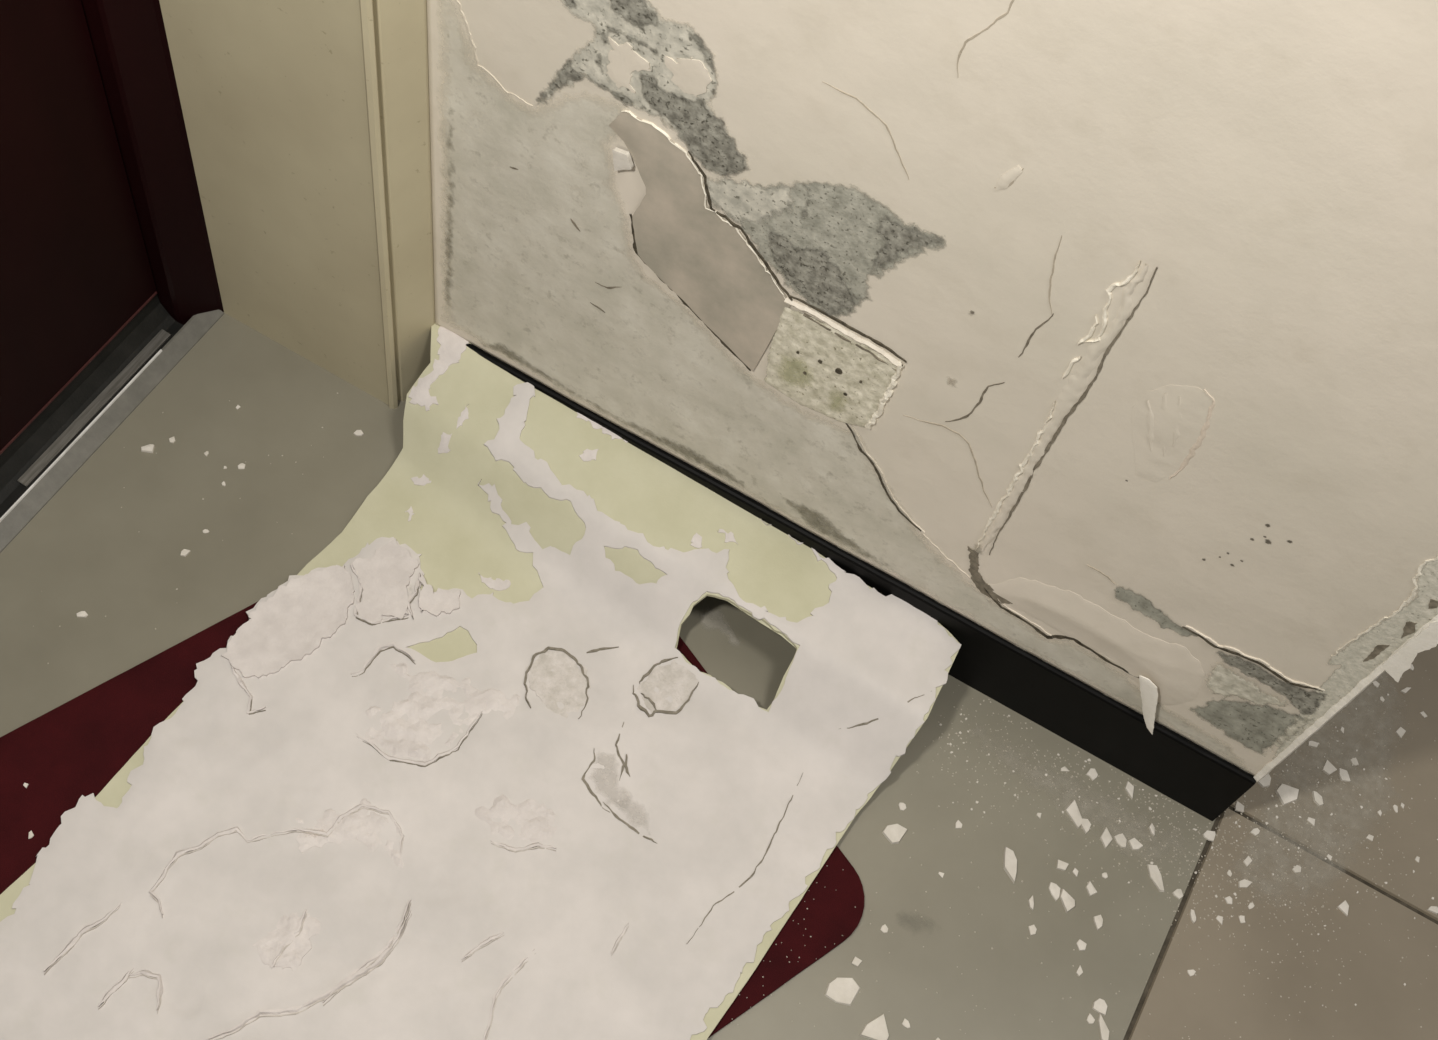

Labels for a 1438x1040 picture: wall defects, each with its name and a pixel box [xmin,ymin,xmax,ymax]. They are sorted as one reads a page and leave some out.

crack [957,0,1014,73]
crack [822,81,909,179]
crack [845,423,925,533]
peeling [441,0,1438,844]
crack [903,236,1157,678]